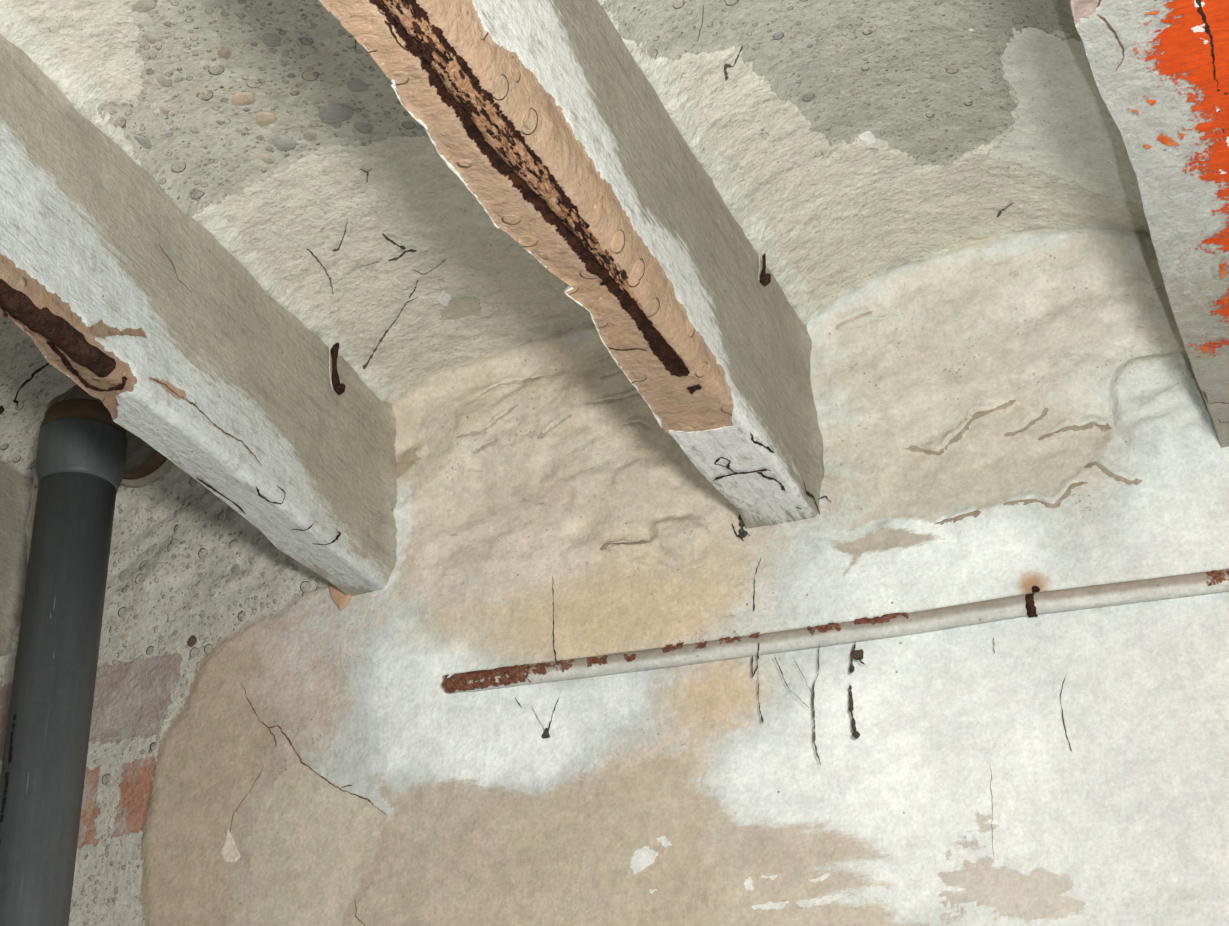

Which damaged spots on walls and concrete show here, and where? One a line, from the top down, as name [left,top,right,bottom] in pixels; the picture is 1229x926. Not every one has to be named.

spalling [97,0,735,445]
spalling [0,252,147,595]
flaking render [0,622,21,779]
flaking render [69,464,352,926]
water stain [139,616,291,926]
rust [442,655,608,693]
water stain [365,536,777,683]
water stain [476,651,804,754]
rust [660,632,760,653]
rust [807,612,909,635]
rust [1004,556,1065,597]
water stain [1122,819,1229,926]